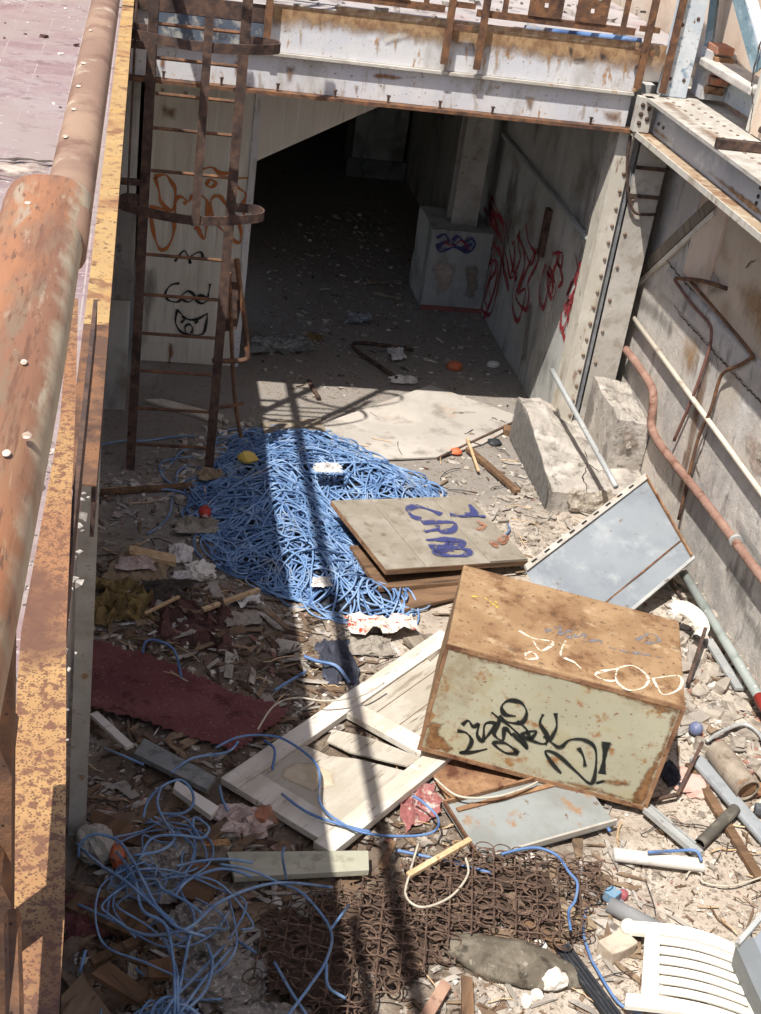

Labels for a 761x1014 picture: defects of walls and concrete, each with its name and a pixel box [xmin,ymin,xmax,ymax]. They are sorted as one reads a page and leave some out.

rust [264,3,667,75]
crack [0,157,53,179]